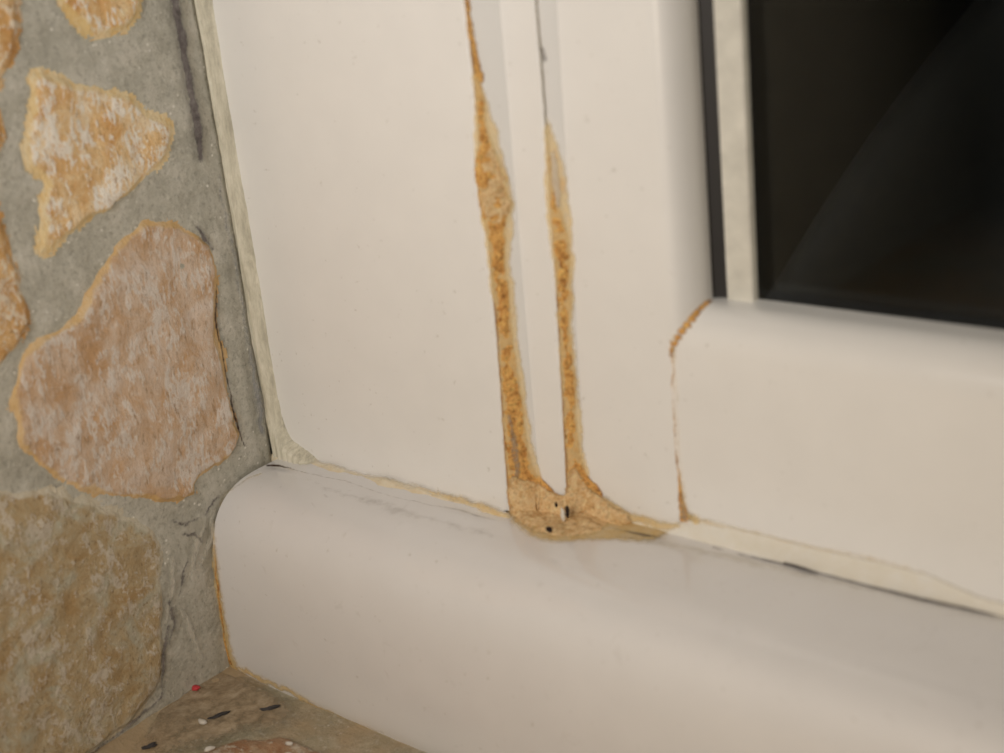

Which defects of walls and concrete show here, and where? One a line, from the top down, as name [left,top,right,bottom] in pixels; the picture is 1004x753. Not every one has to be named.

rust [464,0,665,541]
rust [669,299,711,360]
rust [676,455,698,524]